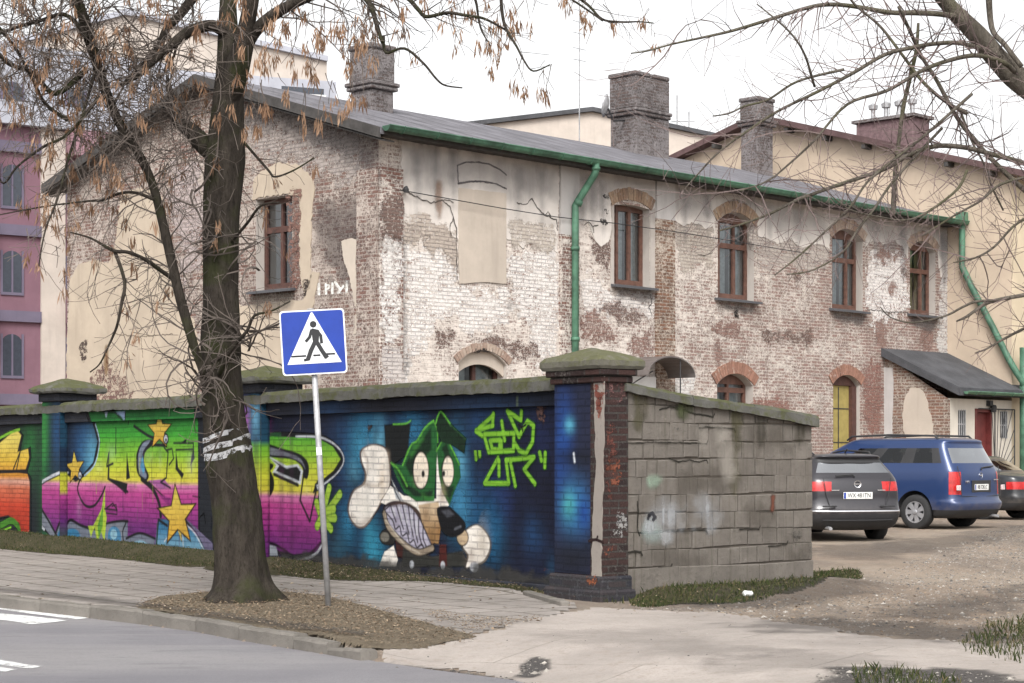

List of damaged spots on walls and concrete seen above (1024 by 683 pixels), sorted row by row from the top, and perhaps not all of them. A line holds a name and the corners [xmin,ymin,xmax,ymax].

peeling [239,162,320,371]
peeling [341,238,356,334]
peeling [378,140,560,284]
spalling [429,326,541,365]
spalling [579,299,654,357]
spalling [711,316,745,366]
spalling [761,326,817,348]
peeling [675,184,948,298]